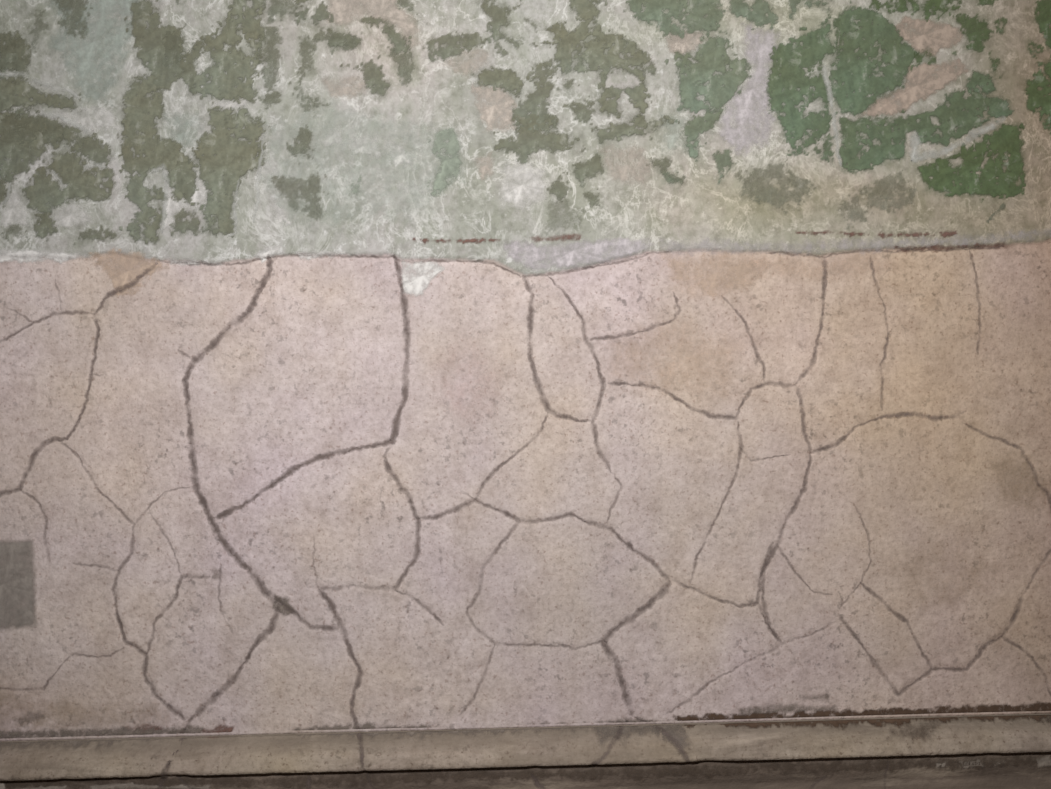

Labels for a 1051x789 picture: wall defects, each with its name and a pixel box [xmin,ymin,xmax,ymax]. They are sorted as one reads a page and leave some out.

peeling [0,0,360,295]
peeling [341,17,413,95]
peeling [427,0,1026,222]
peeling [1026,0,1051,133]
crack [0,273,146,497]
crack [706,318,764,426]
crack [113,256,693,786]
crack [720,547,776,607]
crack [792,401,948,509]
crack [896,609,1037,695]